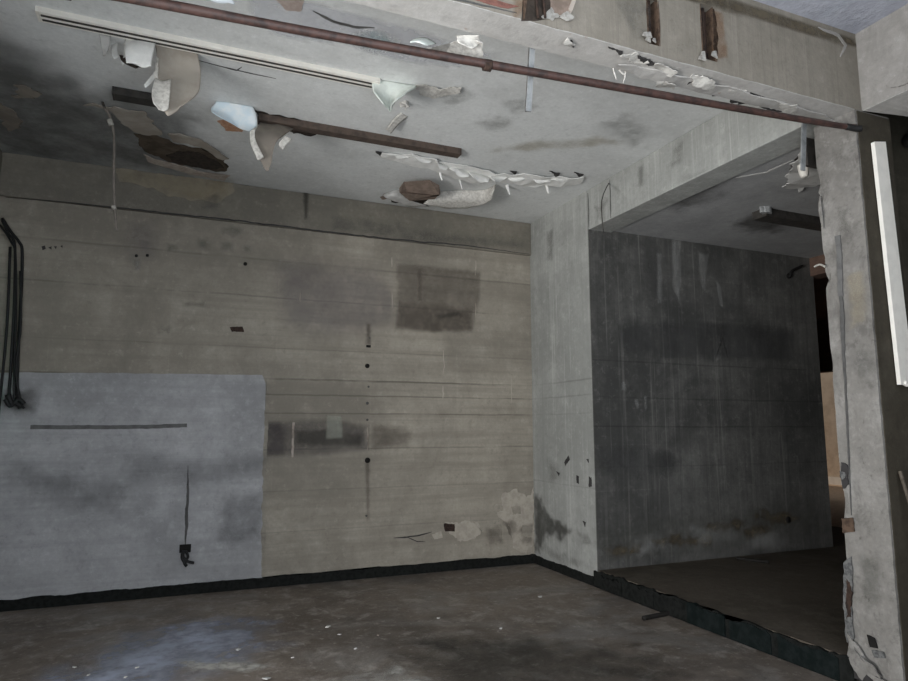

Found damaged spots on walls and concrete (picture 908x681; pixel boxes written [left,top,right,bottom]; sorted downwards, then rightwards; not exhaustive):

spalling [276,0,304,12]
spalling [476,0,576,21]
peeling [83,34,230,181]
peeling [211,101,316,171]
peeling [608,46,834,121]
peeling [376,151,584,209]
damp [535,498,567,549]
spalling [843,557,885,681]